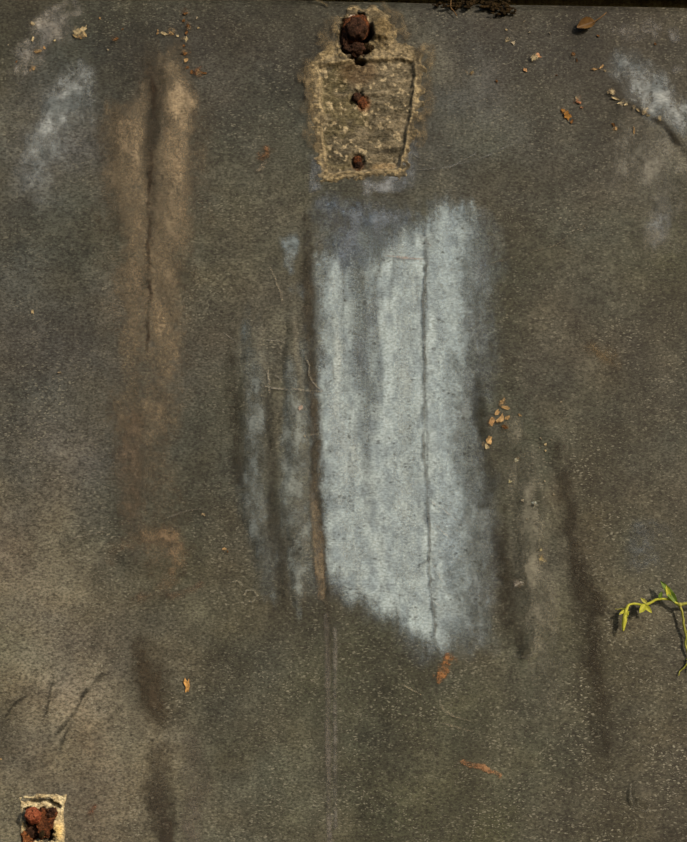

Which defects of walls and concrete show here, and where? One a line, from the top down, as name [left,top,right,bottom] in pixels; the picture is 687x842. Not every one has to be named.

damp [15,6,66,71]
damp [28,69,90,178]
rust [340,31,375,58]
spalling [303,5,427,183]
damp [102,46,196,376]
crack [421,264,429,383]
damp [228,201,492,780]
crack [427,511,437,636]
damp [498,464,557,675]
damp [146,744,199,842]